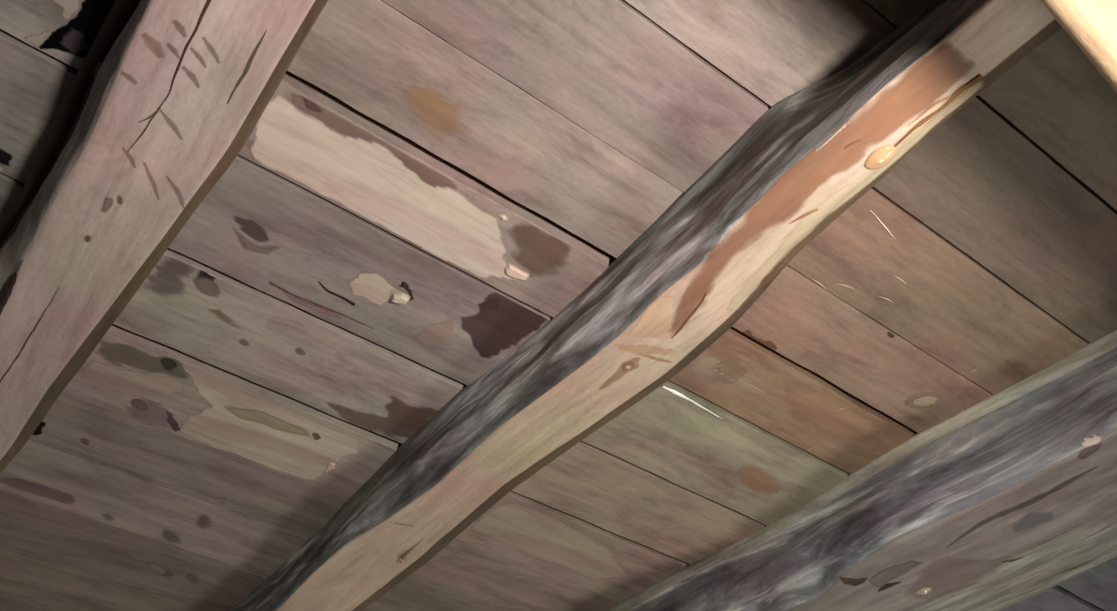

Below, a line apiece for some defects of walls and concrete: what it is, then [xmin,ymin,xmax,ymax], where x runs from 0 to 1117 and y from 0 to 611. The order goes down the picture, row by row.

spalling [26,0,139,63]
crack [129,0,211,150]
crack [227,31,267,104]
peeling [251,95,529,280]
water stain [670,45,973,331]
water stain [236,217,279,253]
water stain [514,226,569,274]
peeling [319,273,414,306]
water stain [462,293,546,358]
water stain [100,343,188,378]
peeling [180,364,358,480]
water stain [329,397,438,438]